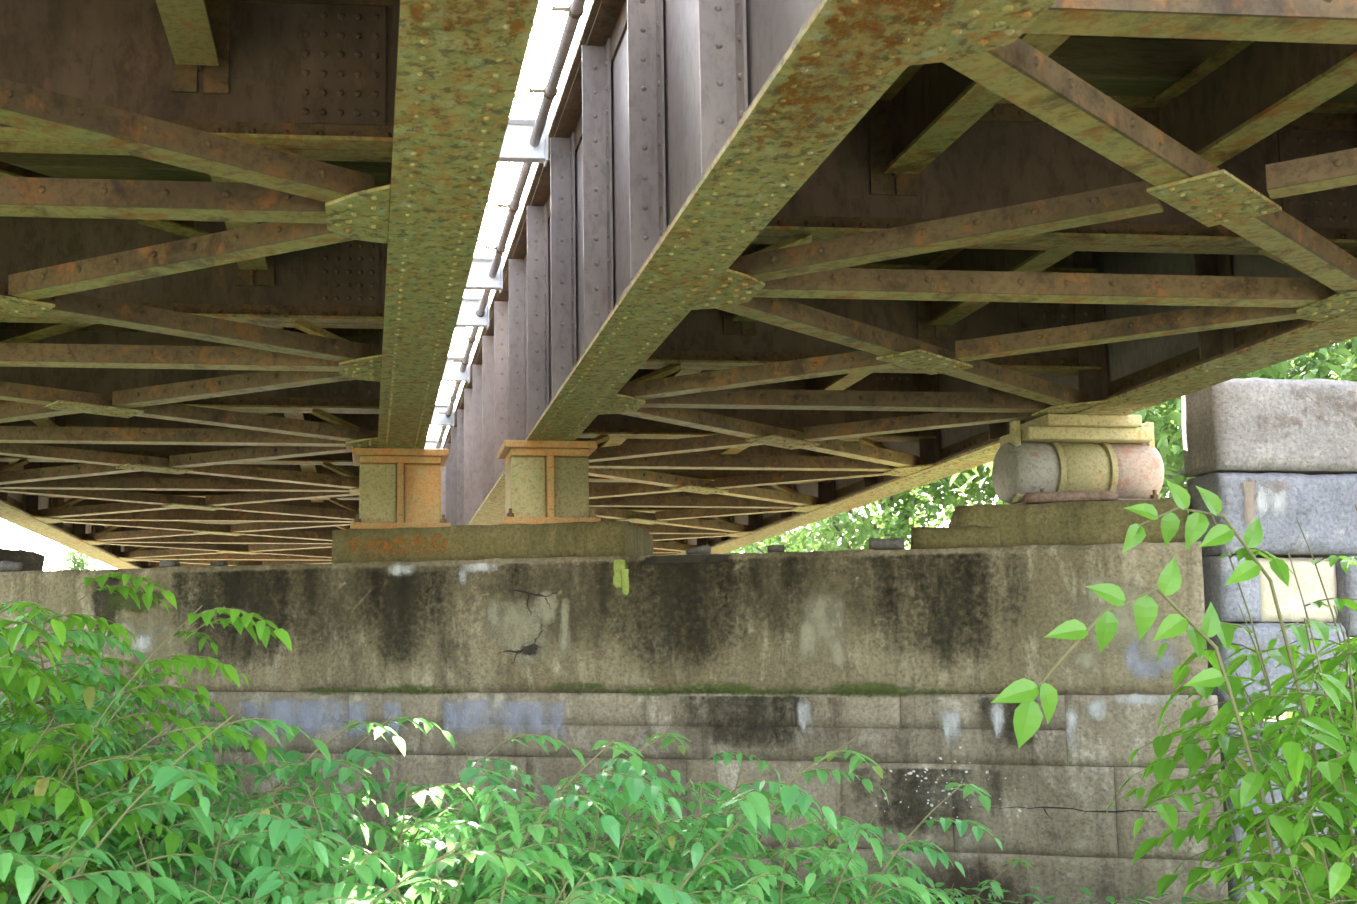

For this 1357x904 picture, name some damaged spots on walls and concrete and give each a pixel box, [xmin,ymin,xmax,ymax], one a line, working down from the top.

rust [410,0,528,65]
rust [726,0,951,167]
damp [188,559,793,664]
damp [838,554,989,663]
damp [880,769,970,830]
crack [977,806,1194,819]